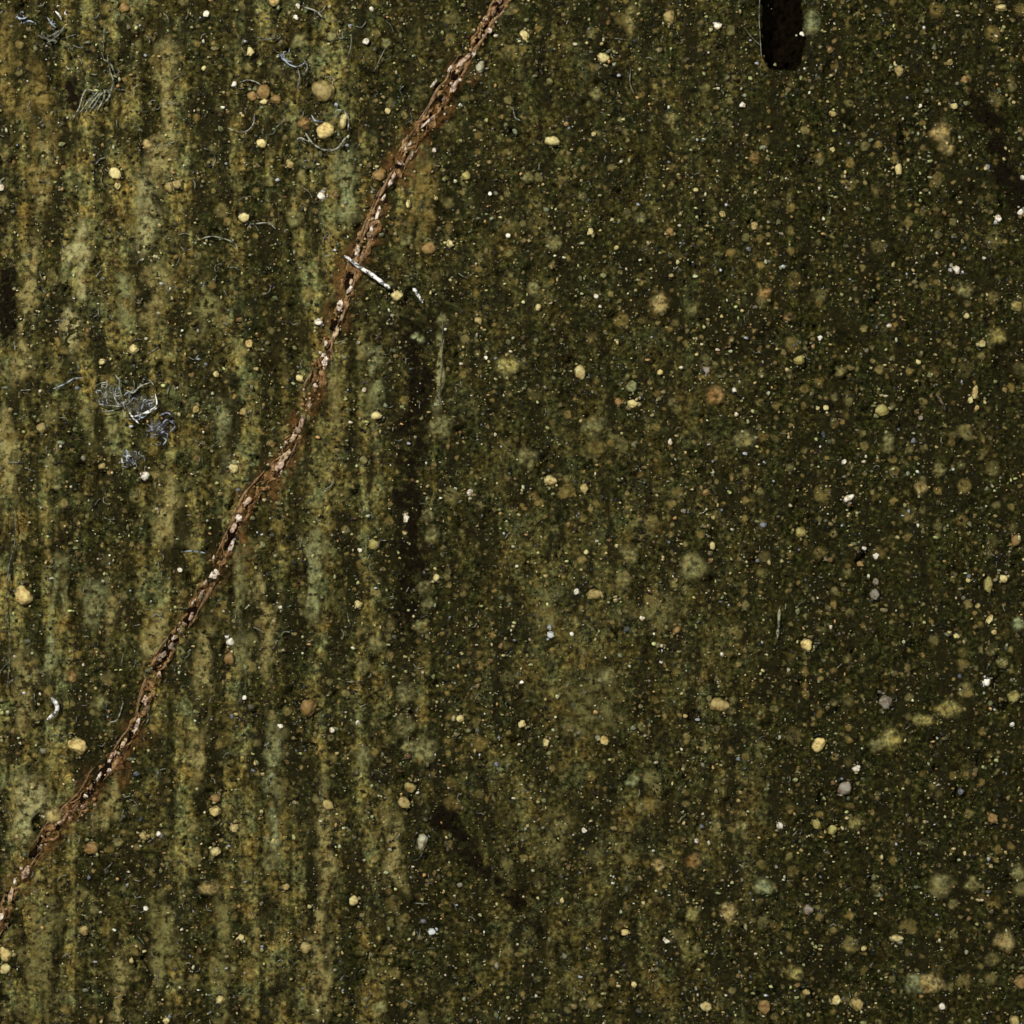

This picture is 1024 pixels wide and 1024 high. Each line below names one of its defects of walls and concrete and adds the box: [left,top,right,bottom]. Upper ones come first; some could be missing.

damp [59,76,84,109]
damp [392,319,433,629]